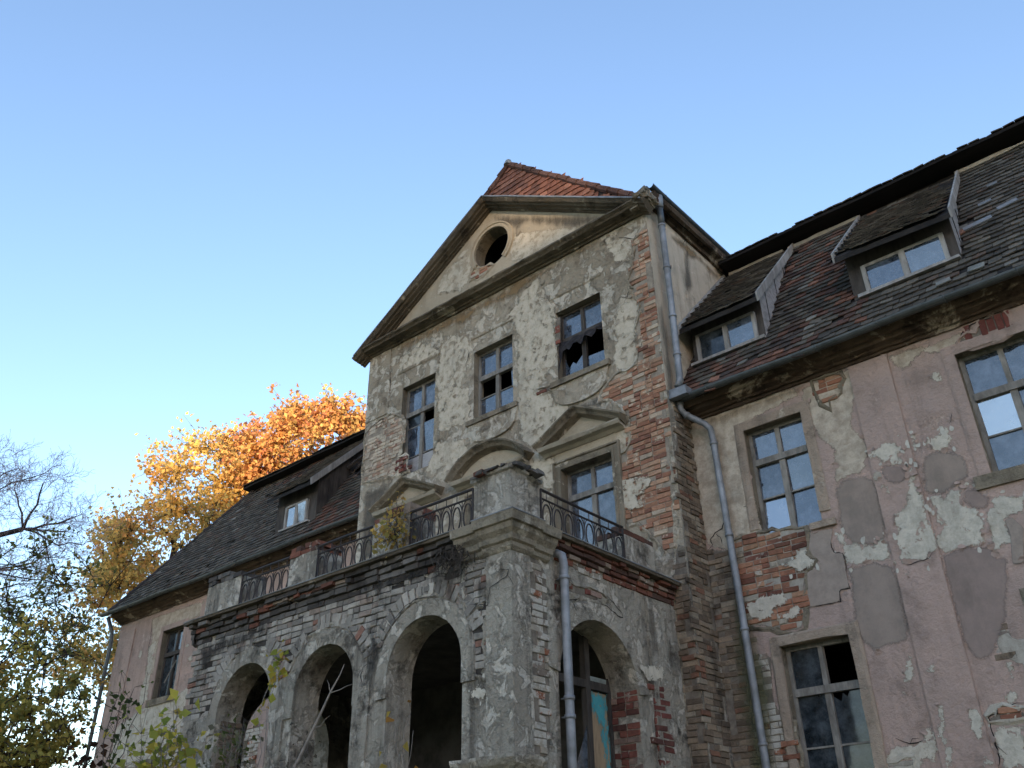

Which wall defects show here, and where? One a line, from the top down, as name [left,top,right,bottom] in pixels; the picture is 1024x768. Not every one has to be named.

peeling [437,254,495,295]
peeling [510,226,576,261]
peeling [398,335,473,485]
peeling [504,279,568,491]
spalling [595,224,1024,768]
spalling [108,559,486,768]